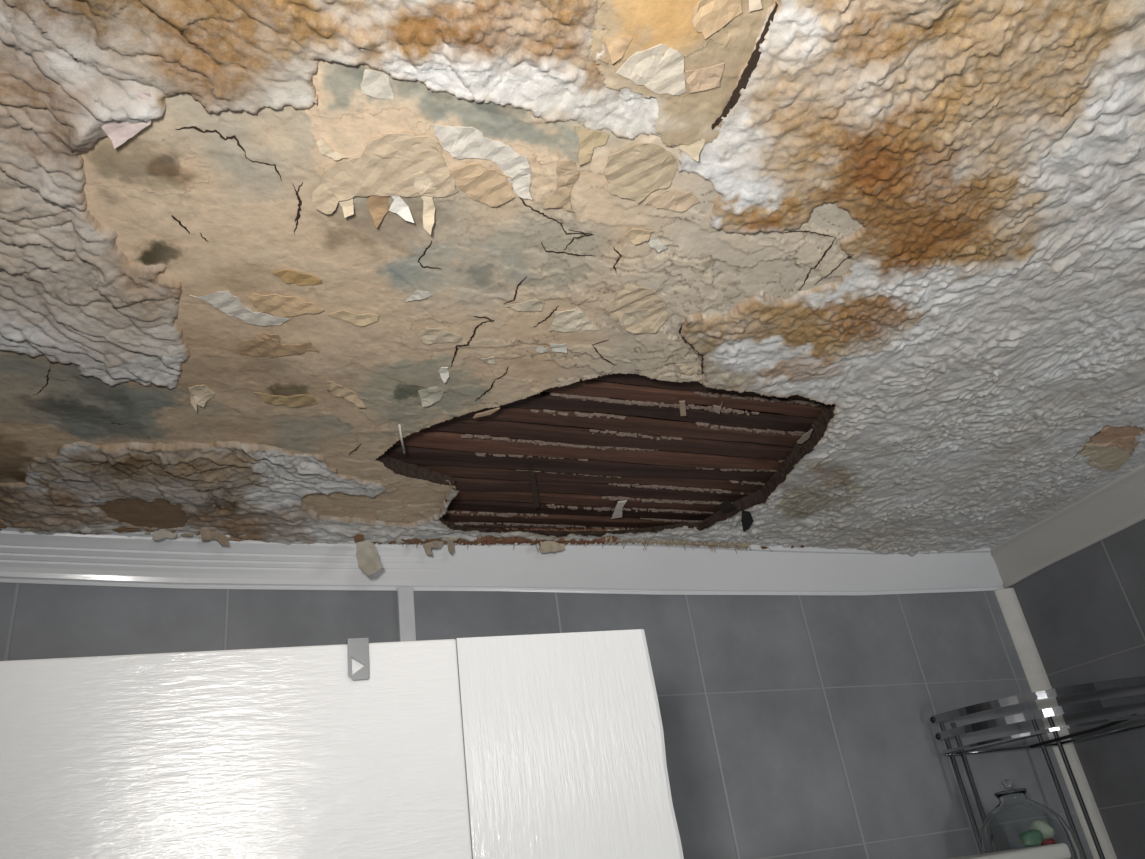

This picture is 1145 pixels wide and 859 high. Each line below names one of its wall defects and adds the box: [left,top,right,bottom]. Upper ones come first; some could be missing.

crack [172,215,209,242]
crack [175,126,303,234]
water stain [0,0,731,545]
crack [418,241,440,269]
peeling [82,0,862,524]
crack [519,197,621,274]
crack [782,231,854,290]
water stain [681,0,1145,393]
crack [451,276,527,367]
crack [679,321,704,378]
peeling [1080,424,1145,472]
water stain [757,453,879,523]